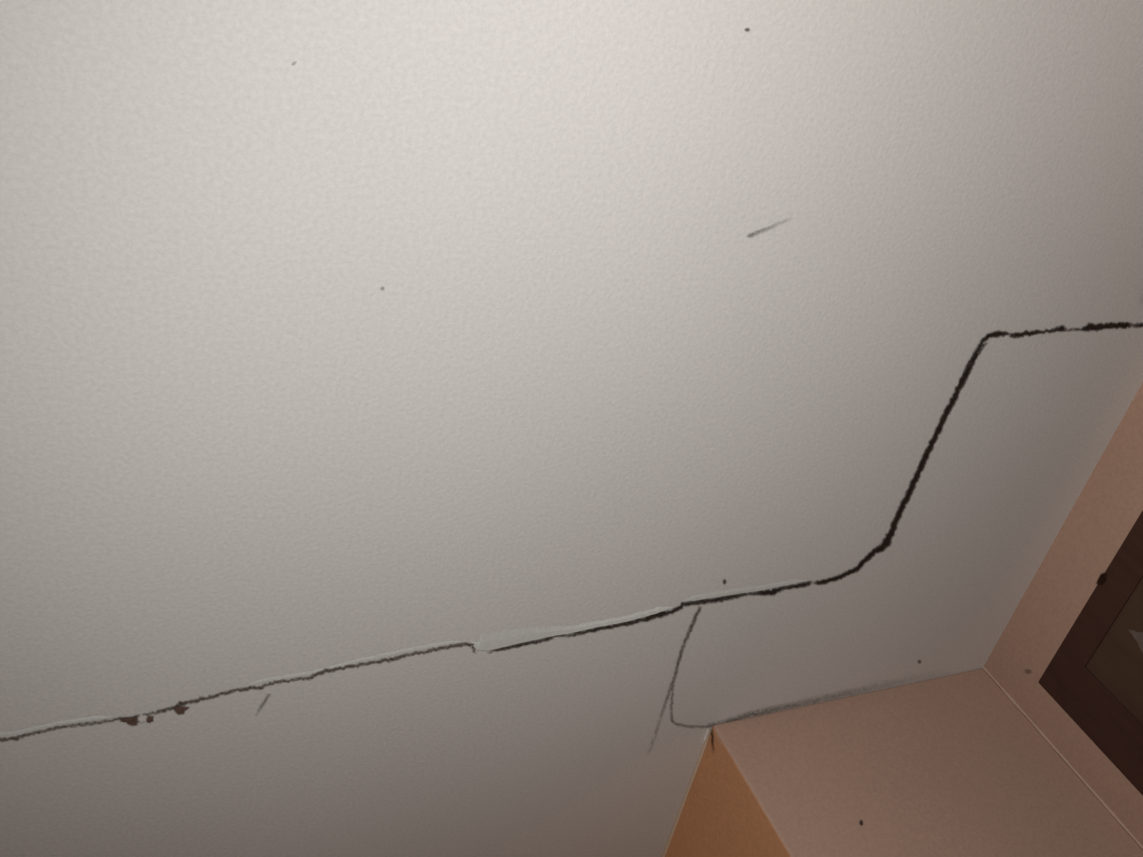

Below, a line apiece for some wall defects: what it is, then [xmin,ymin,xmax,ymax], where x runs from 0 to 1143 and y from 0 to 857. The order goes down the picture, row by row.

crack [0,322,1143,748]